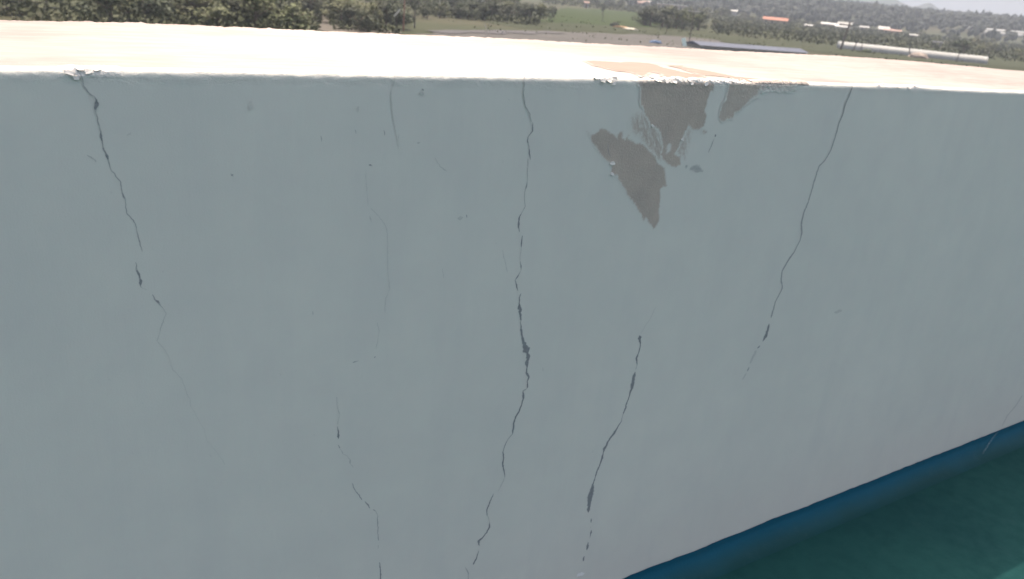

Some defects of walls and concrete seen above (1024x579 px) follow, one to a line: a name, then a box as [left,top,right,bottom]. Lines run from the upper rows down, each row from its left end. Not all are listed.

crack [74,64,225,465]
crack [465,74,533,579]
crack [583,307,656,561]
peeling [584,60,798,230]
crack [742,80,853,380]